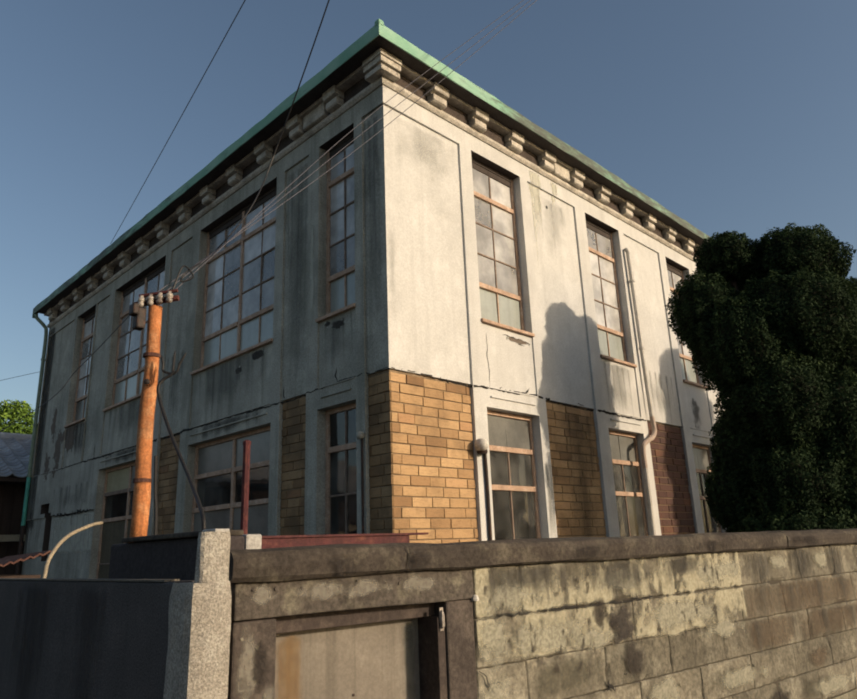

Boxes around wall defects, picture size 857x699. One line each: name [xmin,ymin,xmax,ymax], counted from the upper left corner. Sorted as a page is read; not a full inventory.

peeling [43,406,77,482]
crack [41,334,677,475]
water stain [254,645,267,684]
water stain [475,537,855,695]